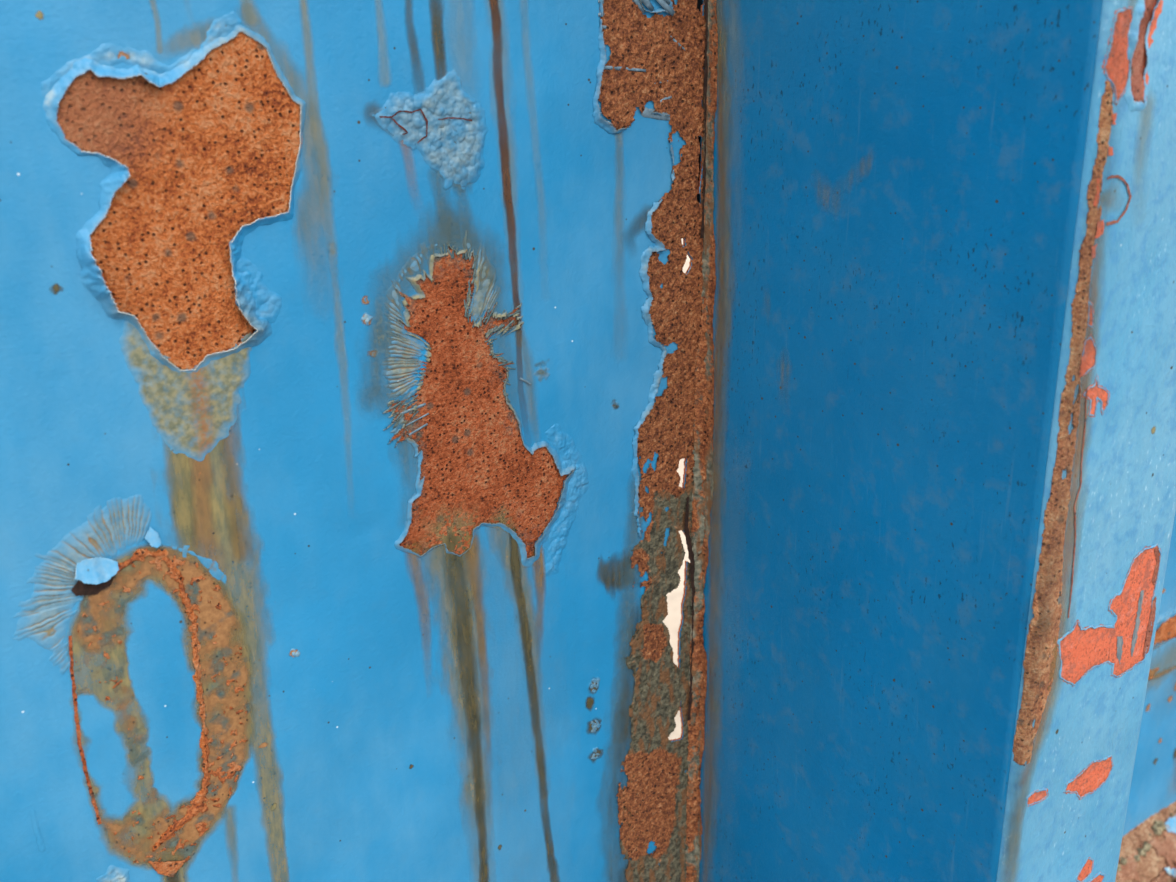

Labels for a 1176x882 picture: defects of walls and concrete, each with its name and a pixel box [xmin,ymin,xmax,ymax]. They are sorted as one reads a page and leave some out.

peeling [1102,6,1133,105]
corrosion [1013,0,1163,766]
corrosion [13,11,314,882]
corrosion [592,0,728,882]
peeling [1057,544,1161,687]
corrosion [1154,608,1176,645]
corrosion [1148,656,1176,702]
peeling [1063,755,1113,800]
peeling [1074,830,1176,882]